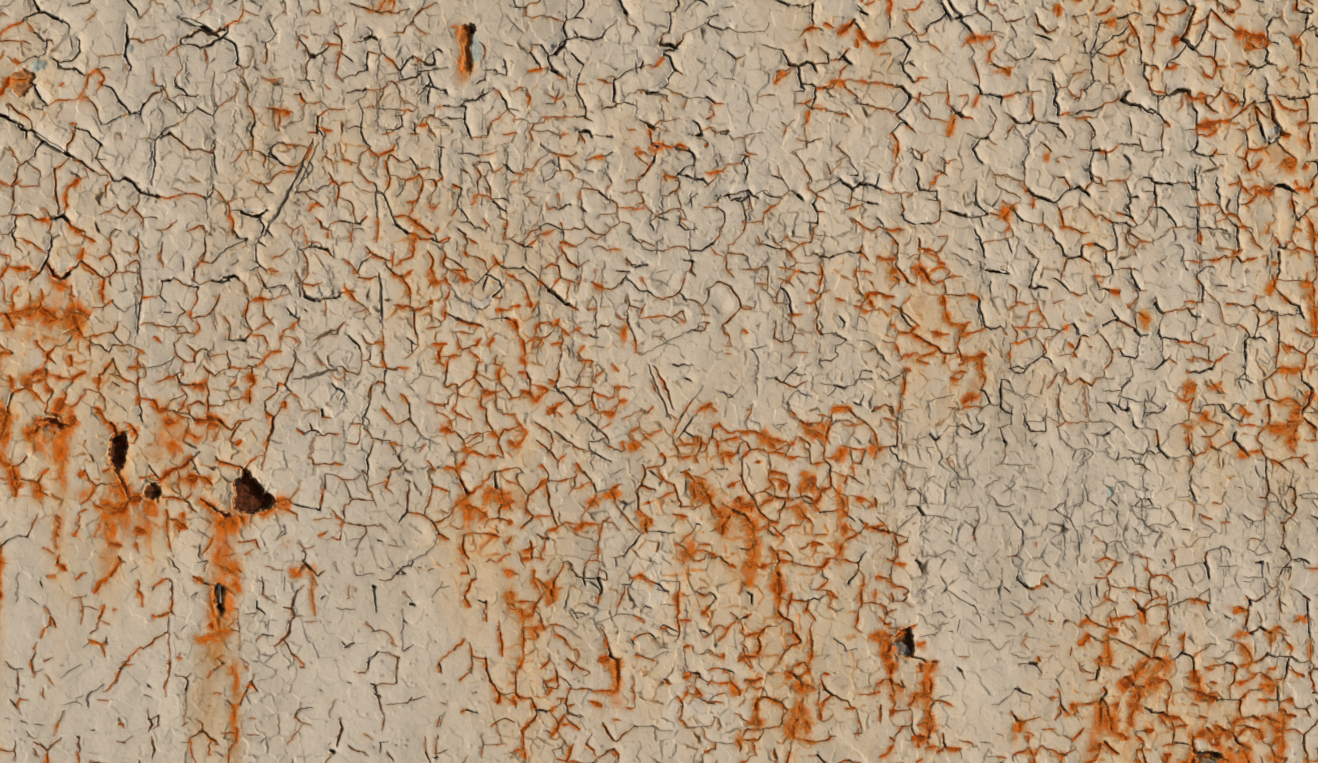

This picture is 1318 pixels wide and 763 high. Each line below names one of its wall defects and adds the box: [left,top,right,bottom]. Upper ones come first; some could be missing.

crack [0,0,344,471]
rust [0,406,76,492]
rust [815,405,849,462]
rust [100,482,168,560]
rust [595,490,622,505]
rust [699,480,761,586]
crack [0,453,227,763]
rust [609,660,622,704]
rust [869,632,899,687]
rust [910,642,933,725]
rust [1070,662,1172,748]
rust [1186,706,1287,763]